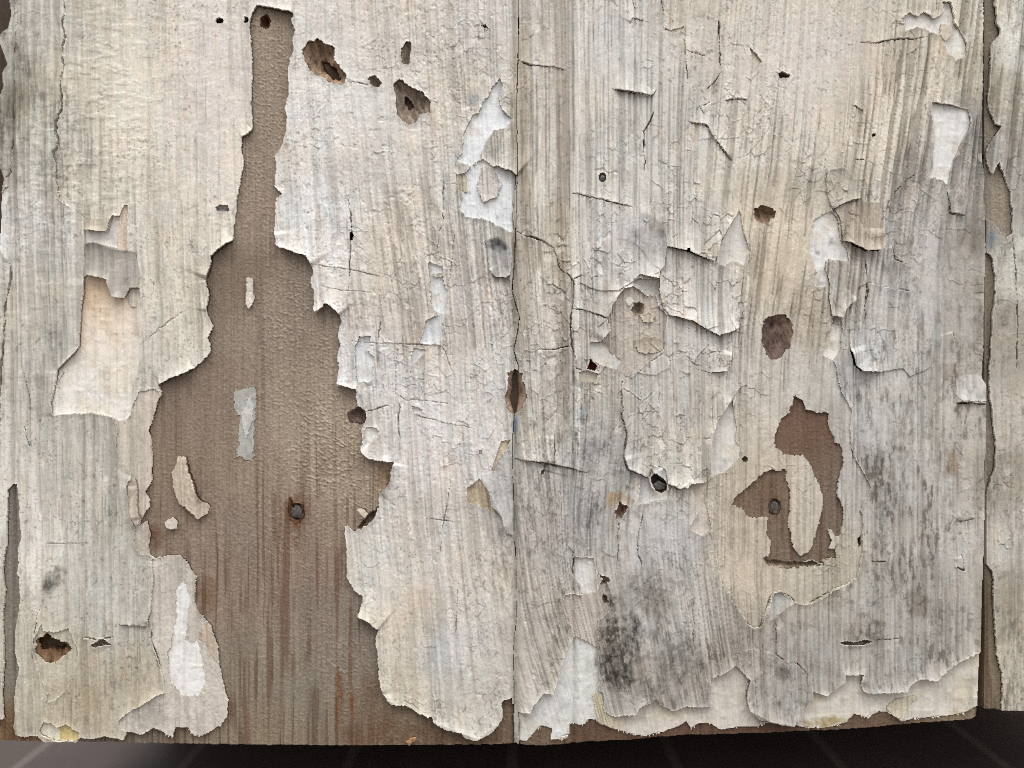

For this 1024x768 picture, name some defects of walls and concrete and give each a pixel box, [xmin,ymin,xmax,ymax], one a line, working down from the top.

peeling [456,79,518,233]
crack [572,193,632,207]
crack [612,89,656,171]
crack [684,21,747,160]
crack [860,36,928,44]
crack [516,231,608,371]
peeling [17,6,462,745]
crack [515,435,587,473]
crack [621,353,679,490]
peeling [578,155,935,627]
peeling [0,484,22,721]
damp [589,566,718,712]